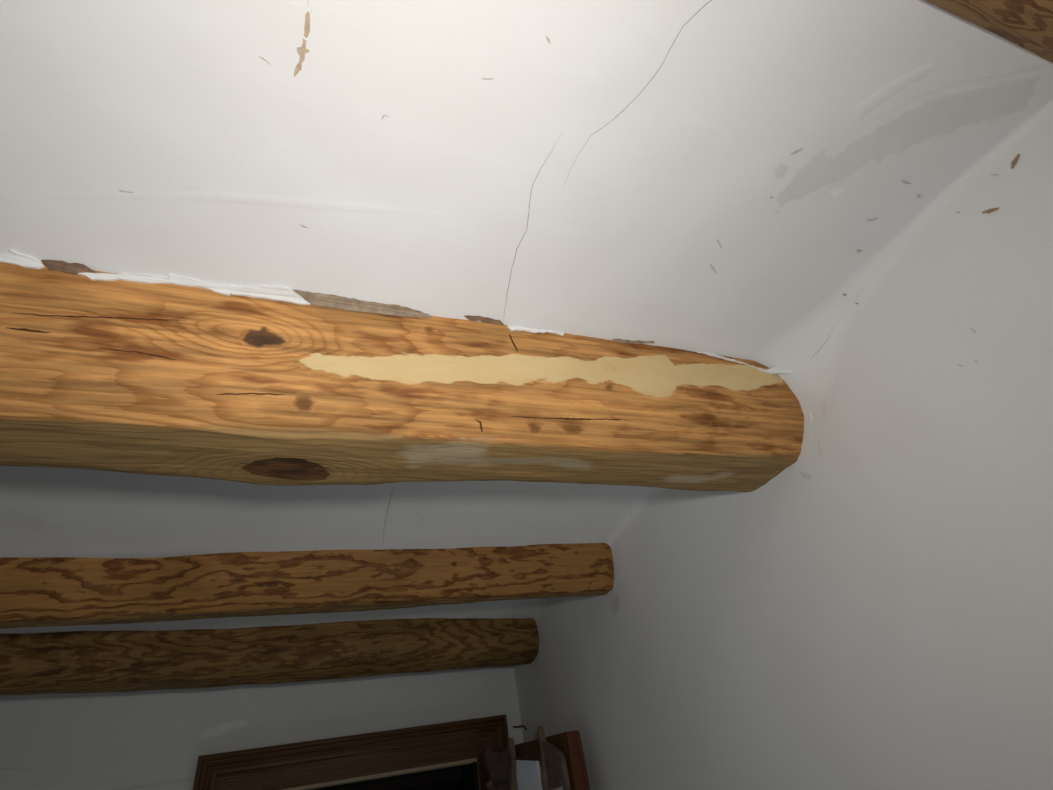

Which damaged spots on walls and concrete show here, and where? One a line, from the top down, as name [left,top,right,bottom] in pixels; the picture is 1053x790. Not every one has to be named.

peeling [294,6,313,77]
crack [503,0,711,321]
flaking render [0,249,432,318]
flaking render [464,315,565,336]
flaking render [697,351,794,375]